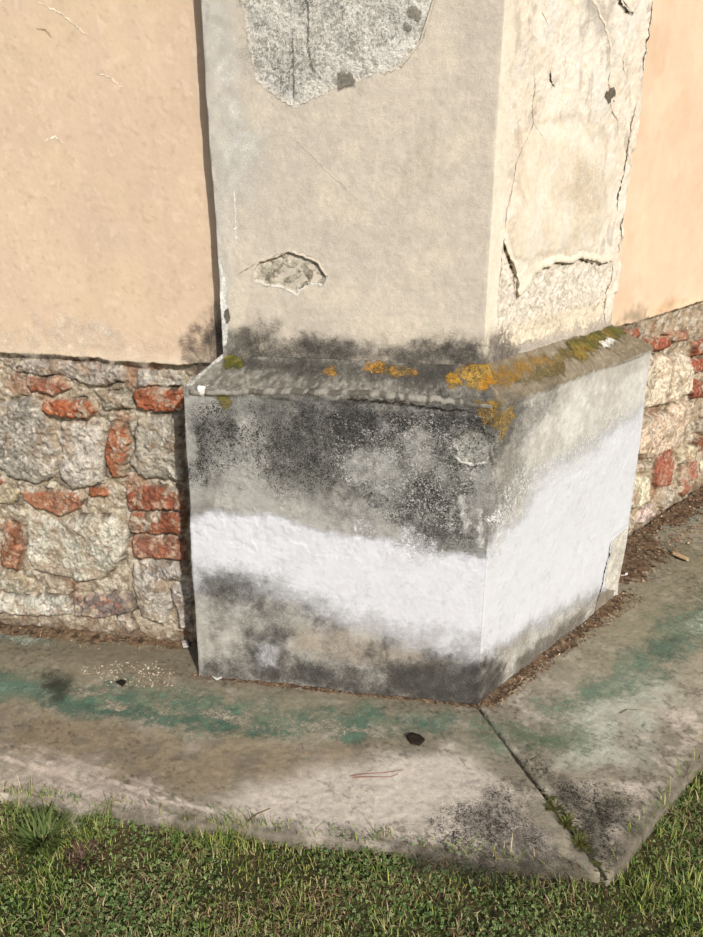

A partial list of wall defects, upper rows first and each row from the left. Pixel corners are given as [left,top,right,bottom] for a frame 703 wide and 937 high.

flaking render [241,0,435,108]
crack [618,0,653,78]
crack [505,72,555,226]
crack [617,107,636,251]
flaking render [240,249,328,296]
spalling [187,258,494,413]
damp [180,296,685,384]
peeling [498,237,614,347]
damp [187,392,556,556]
crack [595,529,627,611]
damp [204,595,595,709]